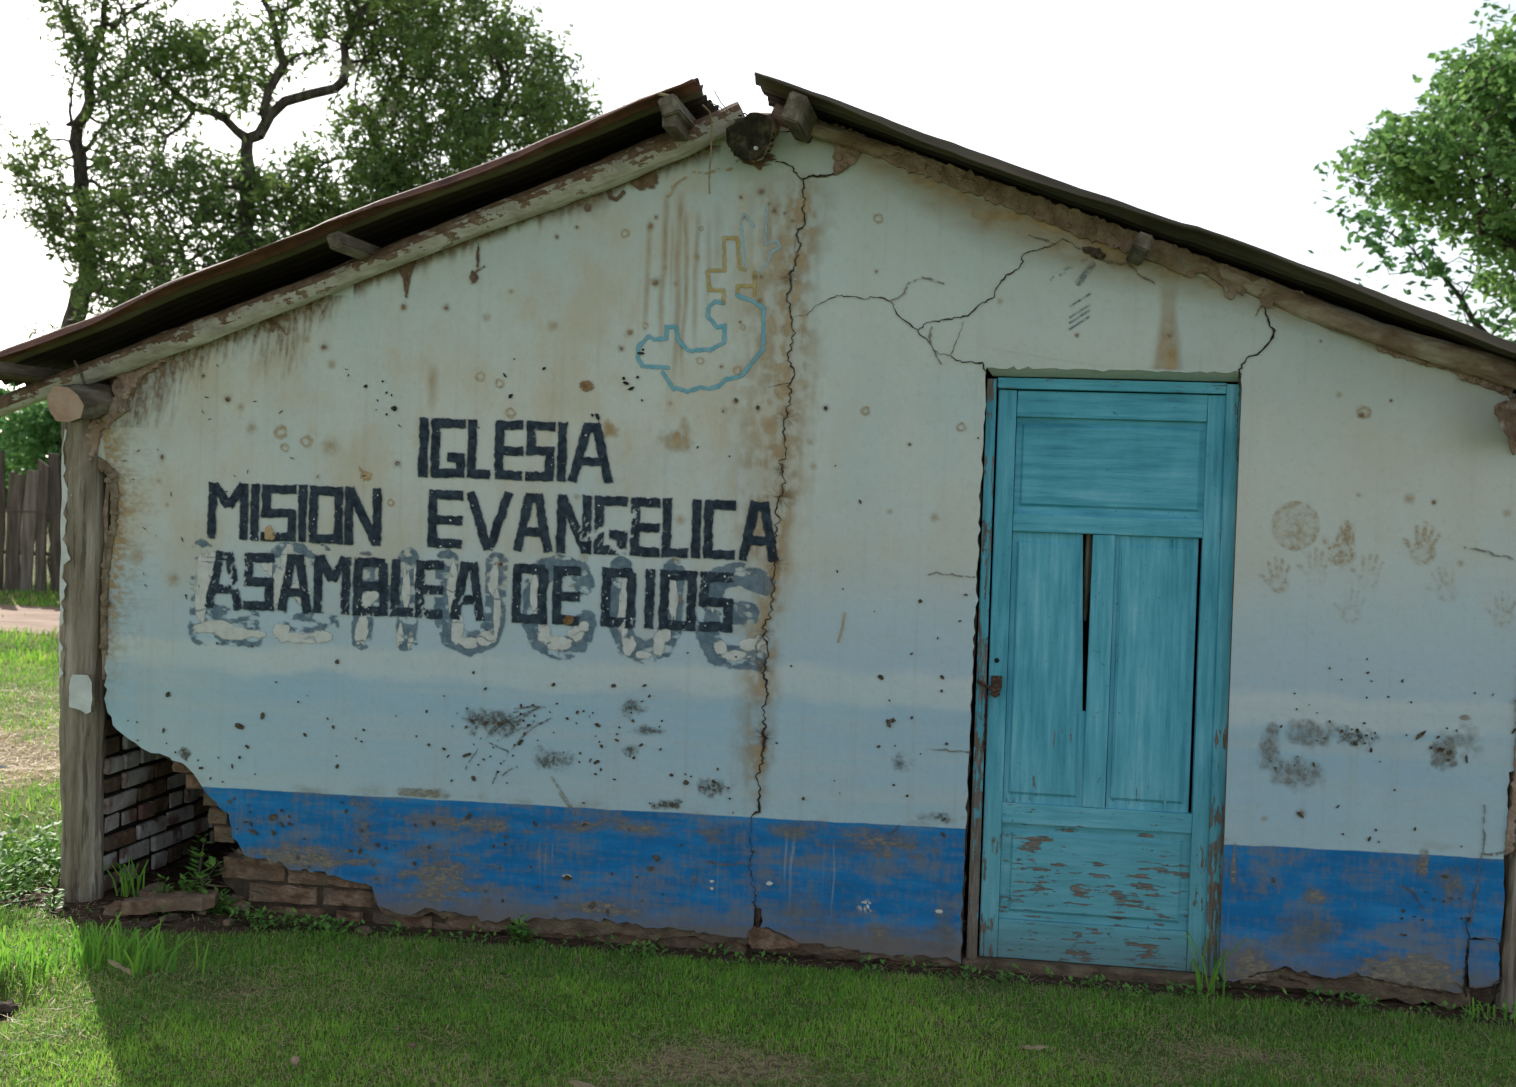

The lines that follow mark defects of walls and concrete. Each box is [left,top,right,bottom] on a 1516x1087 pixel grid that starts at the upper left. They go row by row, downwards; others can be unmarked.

crack [667,131,1154,910]
peeling [186,544,333,647]
peeling [351,580,379,645]
peeling [396,566,430,649]
peeling [439,543,589,651]